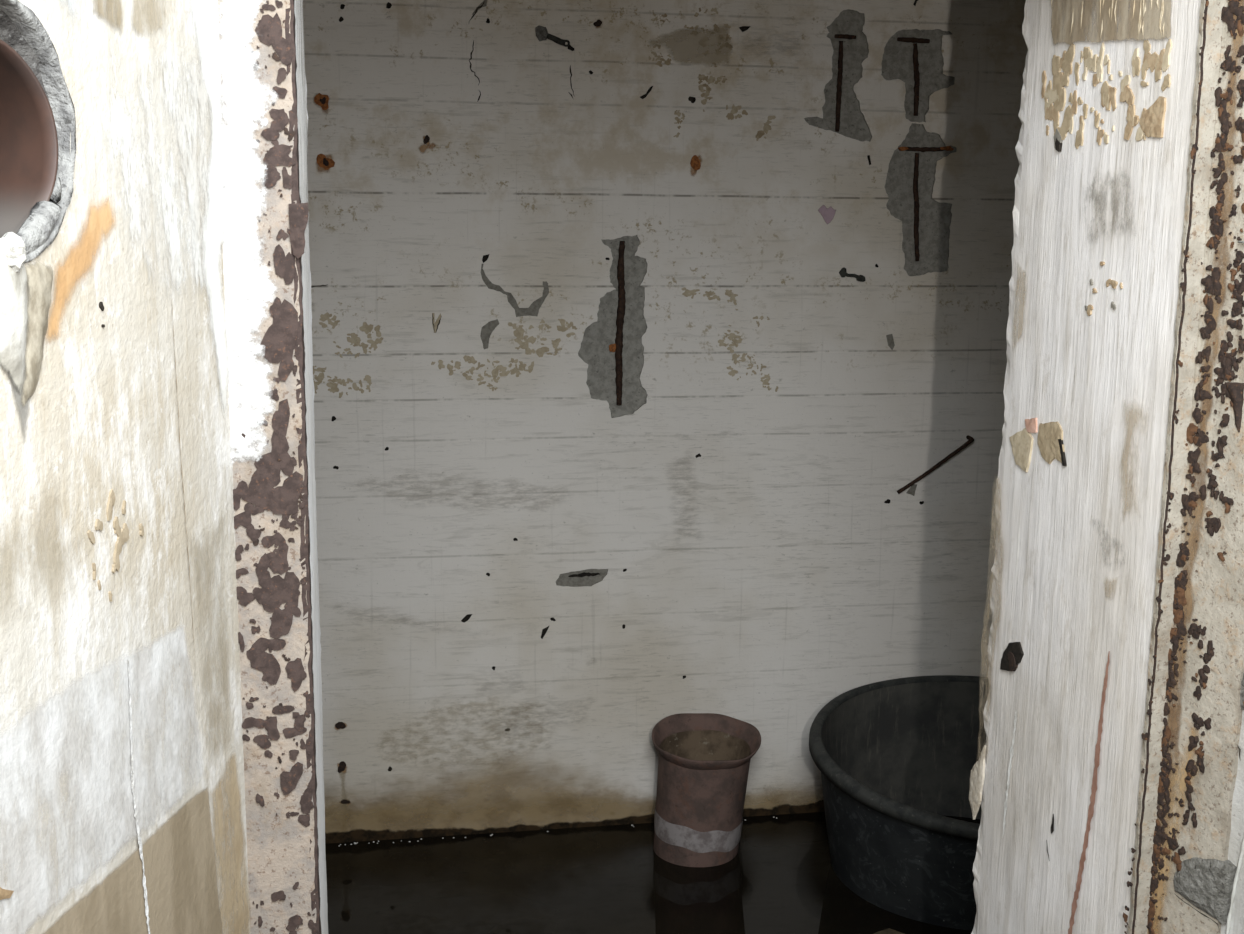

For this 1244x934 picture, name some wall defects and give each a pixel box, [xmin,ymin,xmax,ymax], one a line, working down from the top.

corrosion [314,93,329,112]
peeling [1041,0,1173,152]
corrosion [316,154,335,171]
corrosion [690,155,702,175]
spalling [804,9,957,276]
corrosion [48,201,115,337]
spalling [431,235,647,418]
corrosion [1141,0,1244,934]
spalling [556,569,608,587]
leakage [325,770,656,844]
leakage [743,795,825,817]
spalling [1174,857,1237,924]